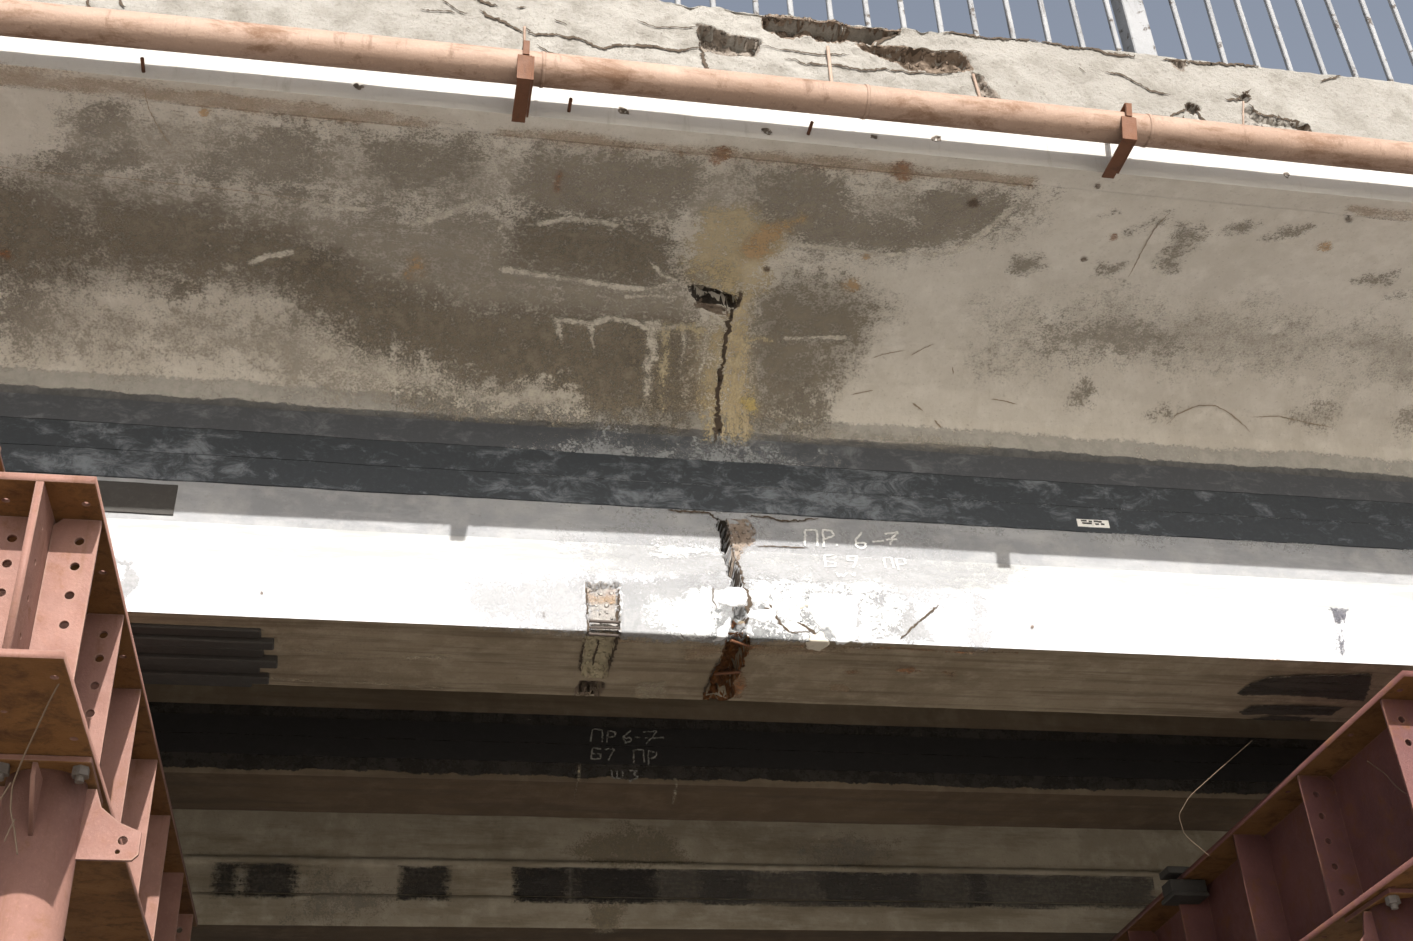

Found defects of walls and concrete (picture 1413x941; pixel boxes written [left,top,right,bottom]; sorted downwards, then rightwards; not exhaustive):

spalling [695,14,1001,99]
damp [0,95,1060,466]
spalling [688,284,738,316]
crack [712,291,743,443]
corrosion [696,292,760,446]
damp [1096,261,1125,276]